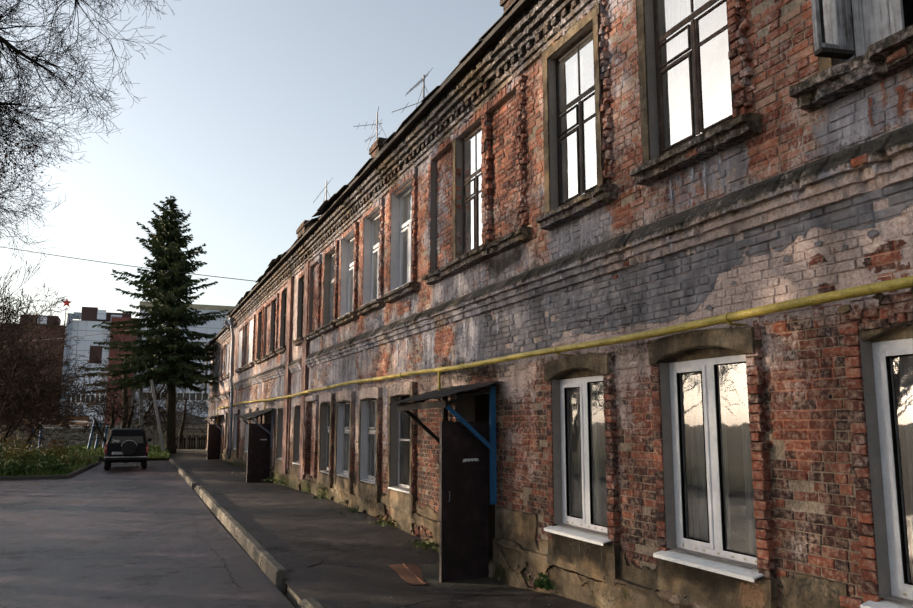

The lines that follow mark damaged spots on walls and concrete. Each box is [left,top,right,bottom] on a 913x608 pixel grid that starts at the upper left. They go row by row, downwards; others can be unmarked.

spalling [887,46,908,63]
peeling [745,125,779,170]
peeling [481,179,913,360]
crack [396,550,626,608]
flaking render [839,595,863,608]